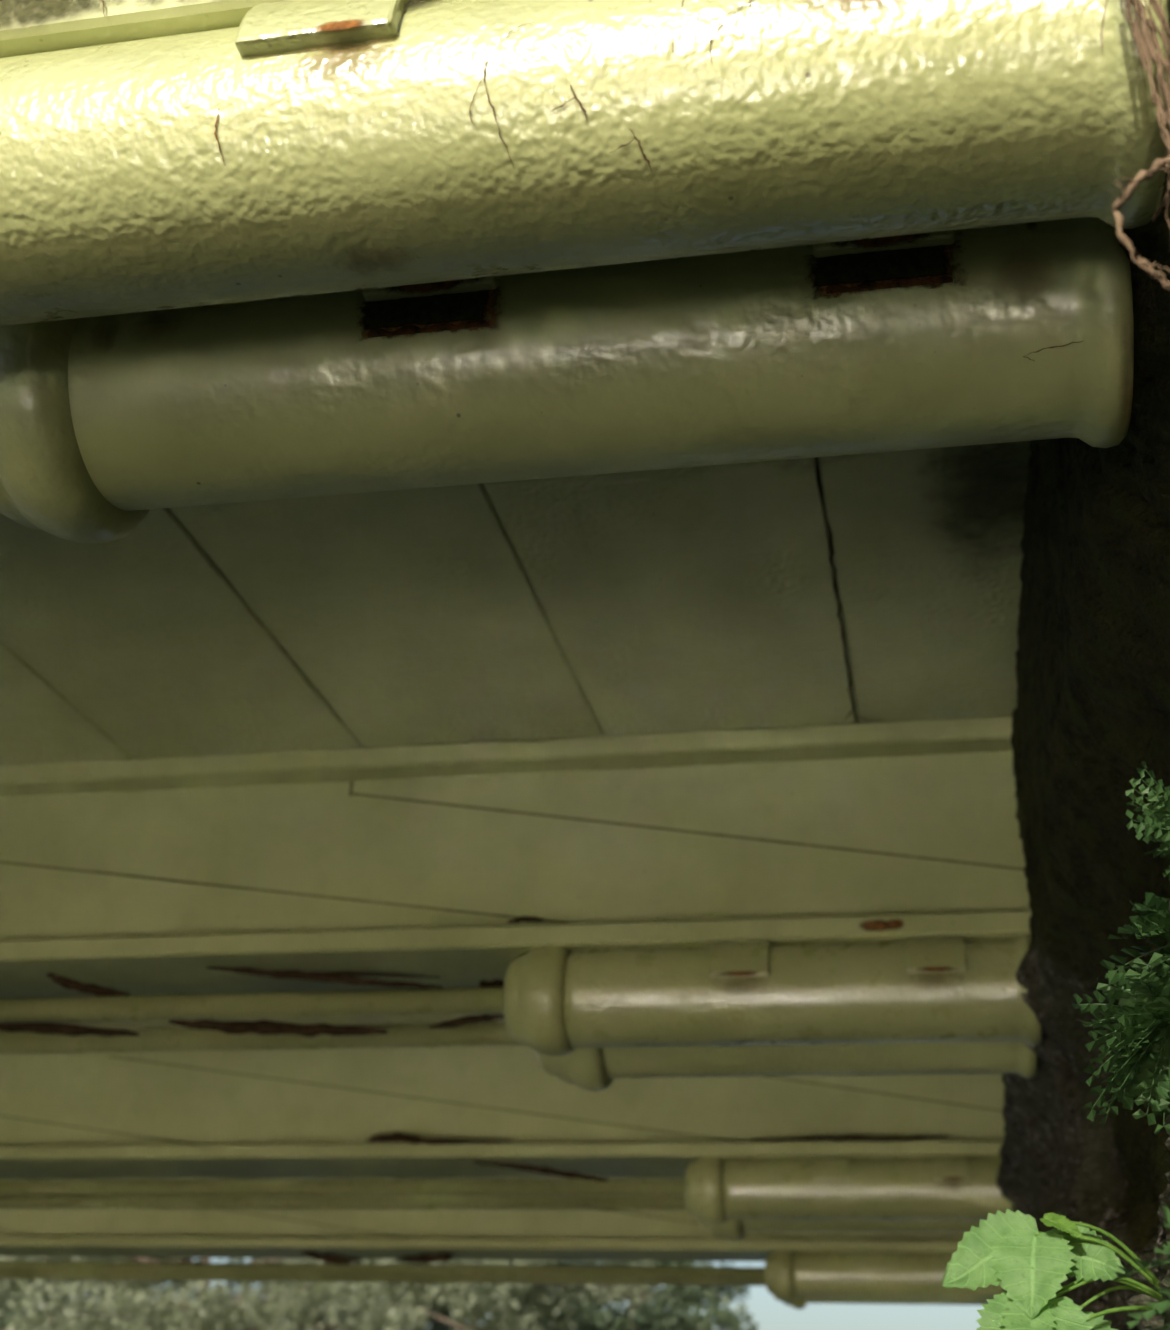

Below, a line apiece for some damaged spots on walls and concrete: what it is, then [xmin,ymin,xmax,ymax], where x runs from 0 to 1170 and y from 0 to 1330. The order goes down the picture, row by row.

rust [315,19,363,31]
damp [941,443,1027,539]
rust [860,920,903,931]